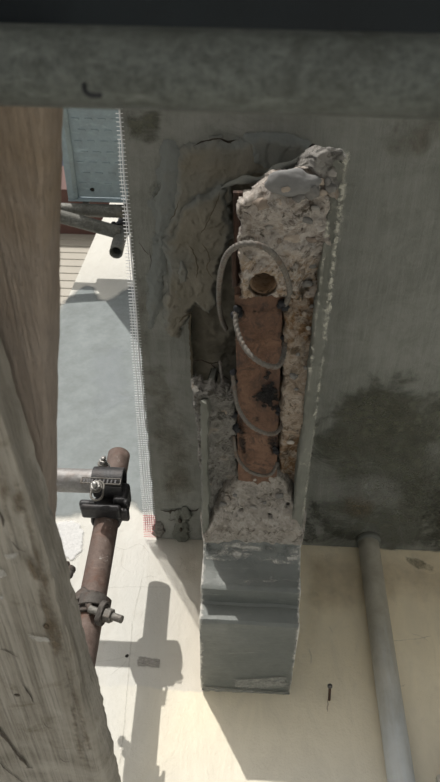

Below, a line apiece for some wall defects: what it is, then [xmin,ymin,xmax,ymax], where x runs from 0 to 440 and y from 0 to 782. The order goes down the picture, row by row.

spalling [151,145,350,694]
damp [303,384,440,550]